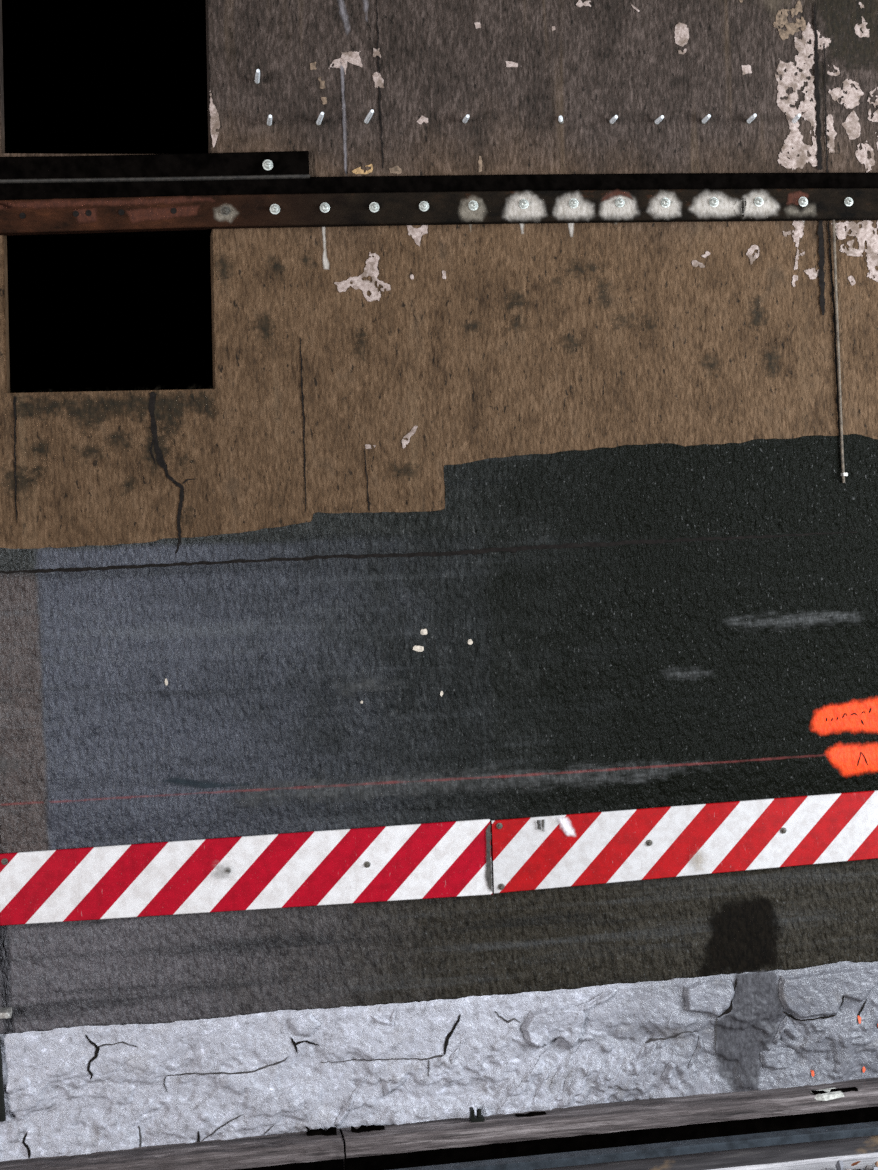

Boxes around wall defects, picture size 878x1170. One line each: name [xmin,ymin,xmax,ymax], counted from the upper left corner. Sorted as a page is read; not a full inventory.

peeling [773,0,878,173]
corrosion [0,197,213,223]
water stain [460,197,485,229]
water stain [505,193,813,237]
peeling [334,252,391,302]
peeling [831,220,878,286]
crack [0,392,857,574]
crack [645,978,737,1053]
crack [783,997,868,1022]
crack [85,1035,136,1080]
crack [164,1015,460,1093]
crack [22,1132,30,1158]